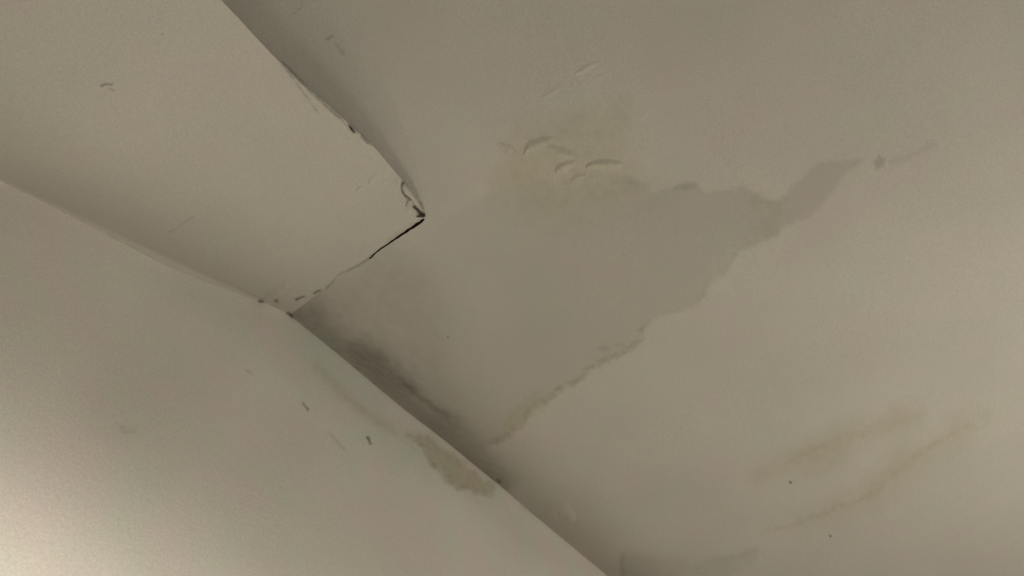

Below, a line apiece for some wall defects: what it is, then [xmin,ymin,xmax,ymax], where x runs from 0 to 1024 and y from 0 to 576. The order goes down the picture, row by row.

crack [369,183,425,259]